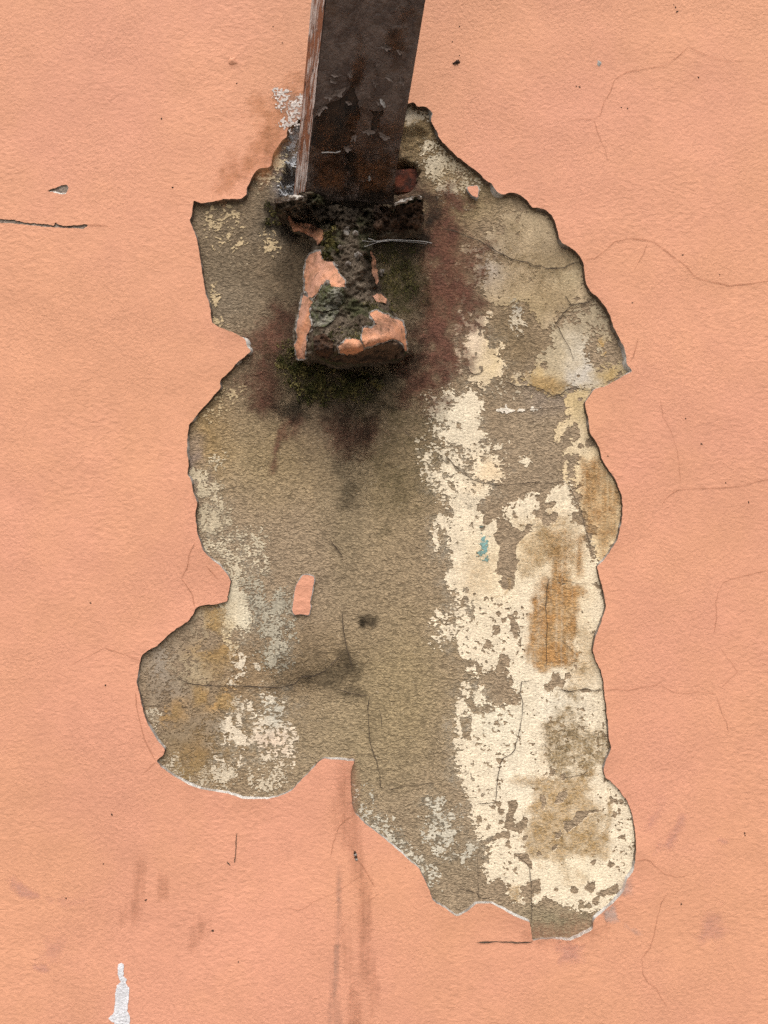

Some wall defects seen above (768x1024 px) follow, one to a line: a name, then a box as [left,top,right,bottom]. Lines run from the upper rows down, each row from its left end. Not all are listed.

water stain [366,190,489,392]
crack [443,228,762,286]
water stain [245,305,378,441]
peeling [137,87,636,941]
corrosion [527,526,584,672]